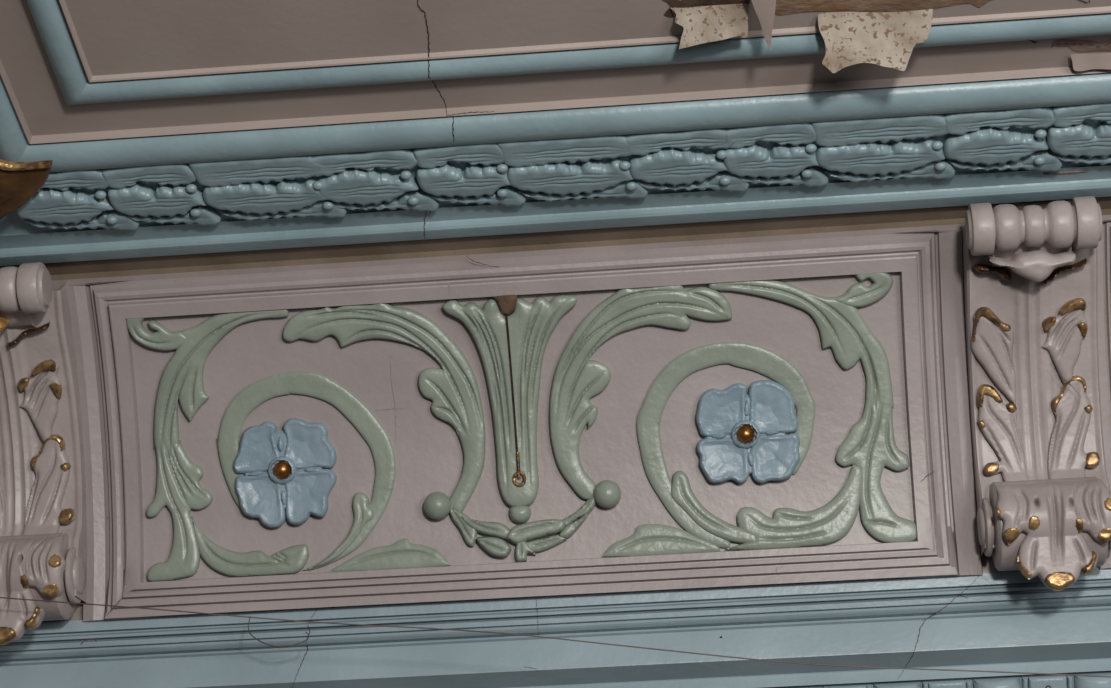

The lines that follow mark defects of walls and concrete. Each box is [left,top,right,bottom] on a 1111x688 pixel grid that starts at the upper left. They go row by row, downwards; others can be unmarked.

crack [417,0,494,137]
peeling [663,0,990,73]
peeling [1052,39,1111,71]
crack [292,607,334,687]
crack [898,576,979,679]